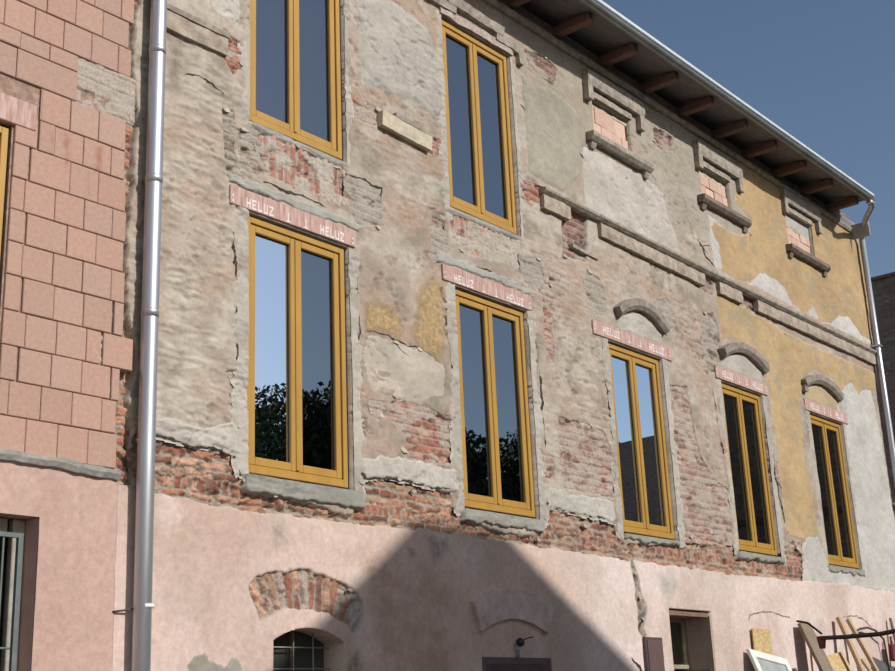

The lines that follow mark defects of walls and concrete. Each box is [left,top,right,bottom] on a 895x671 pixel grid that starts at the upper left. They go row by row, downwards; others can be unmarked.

flaking render [223,28,245,75]
flaking render [220,108,386,230]
crack [231,232,239,277]
peeling [711,163,871,340]
peeling [154,280,876,581]
crack [536,343,546,445]
crack [773,456,785,522]
crack [627,554,647,637]
peeling [187,652,243,671]